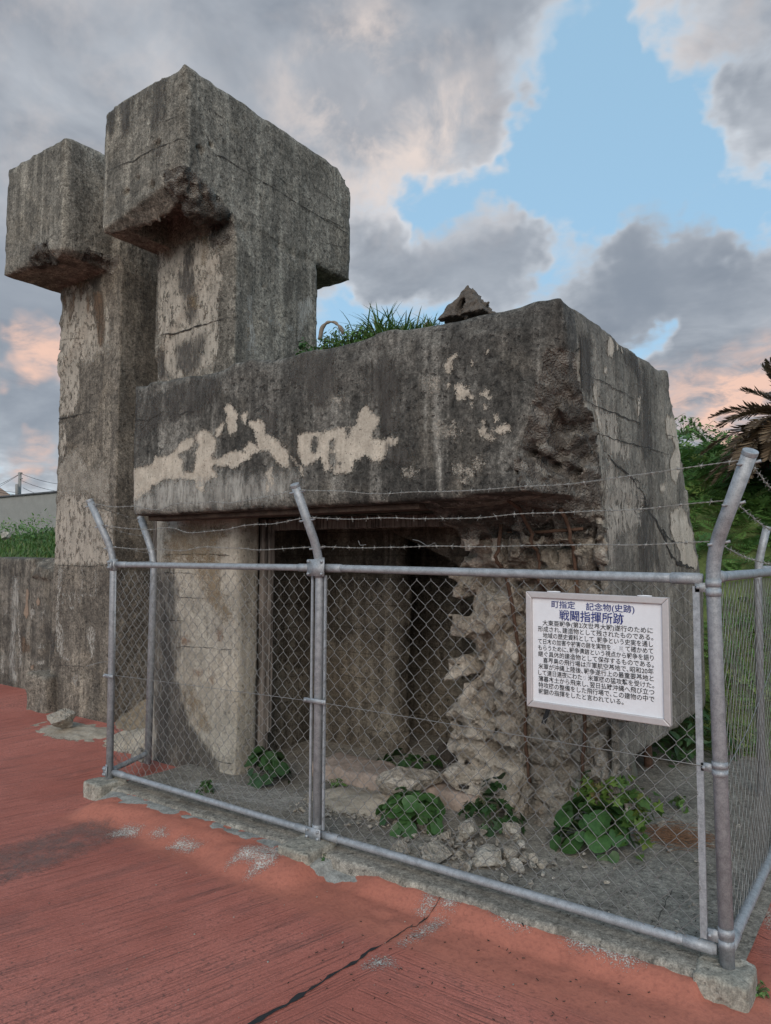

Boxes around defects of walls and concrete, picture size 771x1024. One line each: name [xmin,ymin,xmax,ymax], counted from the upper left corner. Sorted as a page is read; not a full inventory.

spalling [29,240,60,270]
peeling [157,165,235,381]
crack [162,317,230,341]
peeling [133,397,399,501]
crack [575,338,696,572]
peeling [660,414,681,493]
peeling [670,506,698,570]
spalling [424,347,632,832]
crack [384,896,441,944]